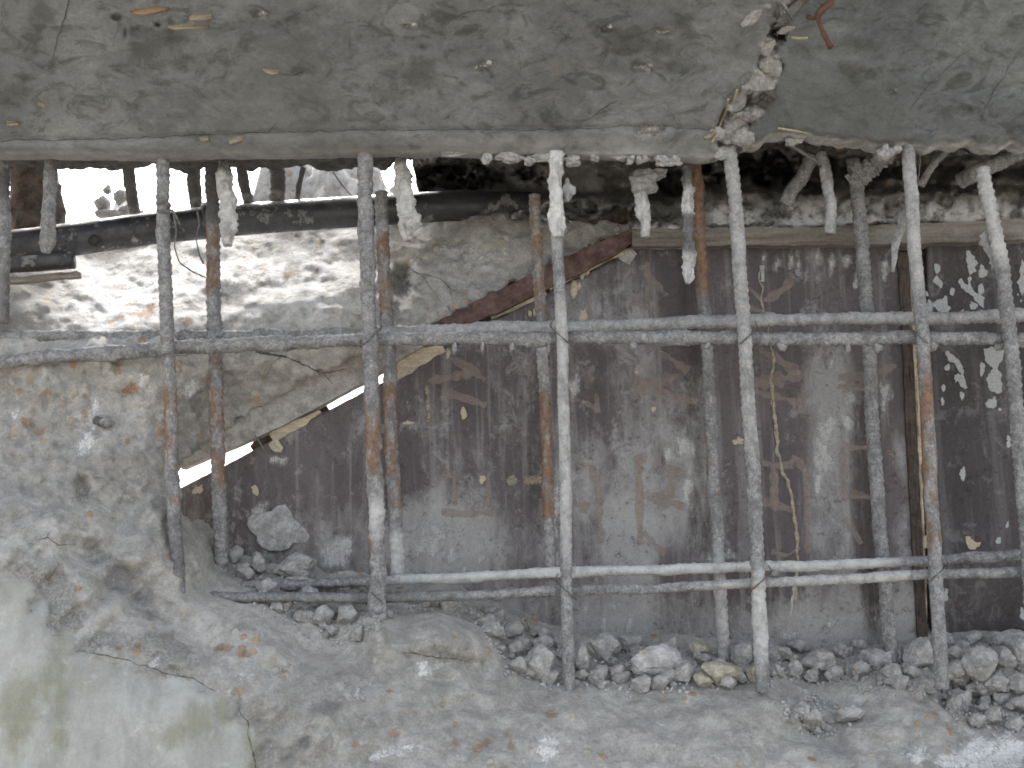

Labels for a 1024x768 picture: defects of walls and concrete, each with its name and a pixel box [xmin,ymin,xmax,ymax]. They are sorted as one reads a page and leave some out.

crack [0,0,808,147]
crack [256,351,346,384]
spalling [0,143,1024,693]
crack [80,650,217,692]
crack [238,708,256,768]